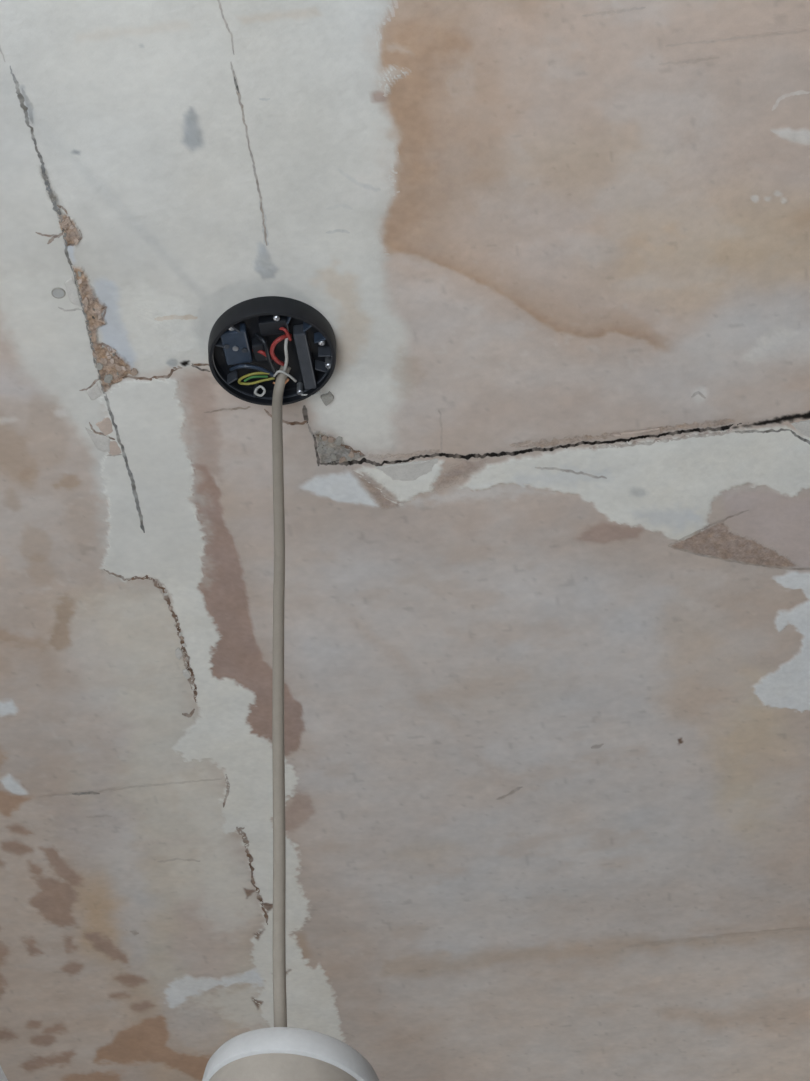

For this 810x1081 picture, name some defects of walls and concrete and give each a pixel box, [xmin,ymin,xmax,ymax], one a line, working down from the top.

crack [0,47,210,533]
crack [217,0,269,246]
leakage [353,0,679,356]
crack [103,569,198,718]
peeling [0,0,419,1045]
leakage [188,368,309,758]
crack [204,391,810,511]
peeling [295,424,810,714]
leakage [0,740,225,1081]
crack [36,774,273,925]
leakage [285,788,320,835]